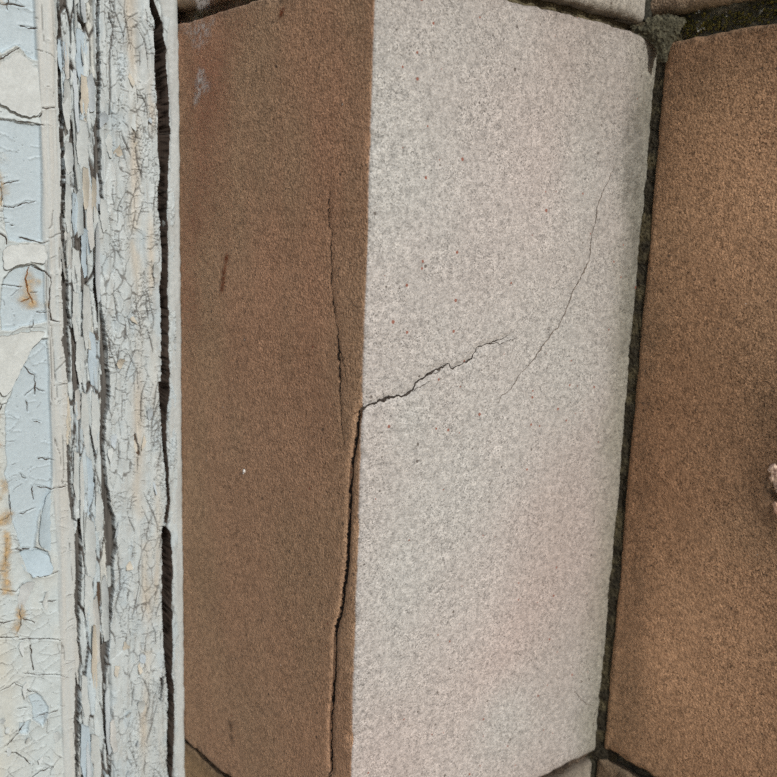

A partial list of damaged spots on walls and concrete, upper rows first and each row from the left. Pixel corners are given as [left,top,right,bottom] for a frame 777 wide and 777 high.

peeling [0,49,42,117]
peeling [2,243,48,270]
crack [500,169,614,399]
peeling [0,331,45,396]
peeling [54,0,122,777]
crack [328,198,515,777]
spalling [767,463,777,518]
peeling [18,492,53,611]